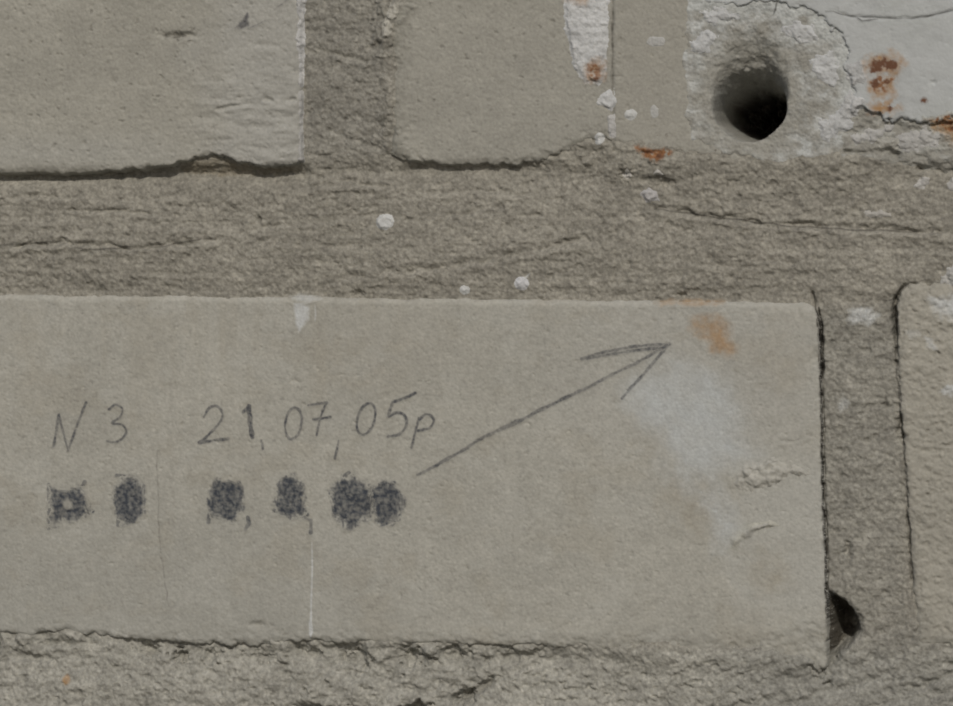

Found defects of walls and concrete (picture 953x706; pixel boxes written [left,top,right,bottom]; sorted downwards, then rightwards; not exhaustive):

crack [824,9,953,23]
rust [581,55,609,86]
spalling [682,0,953,189]
rust [860,46,911,119]
rust [919,96,953,150]
crack [877,278,927,599]